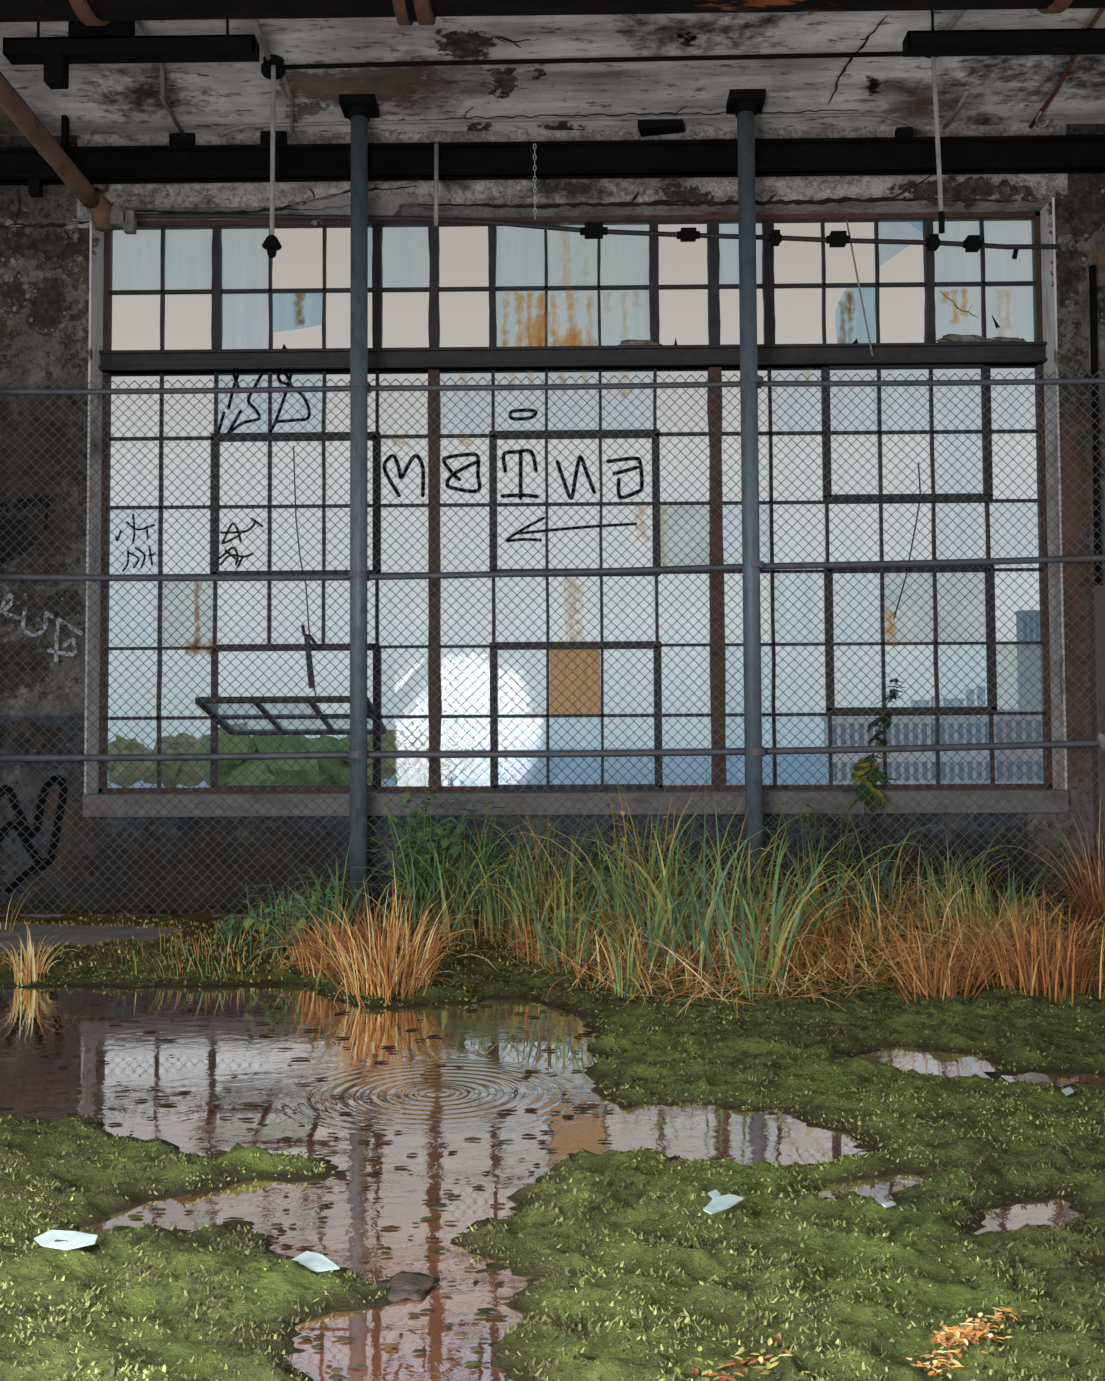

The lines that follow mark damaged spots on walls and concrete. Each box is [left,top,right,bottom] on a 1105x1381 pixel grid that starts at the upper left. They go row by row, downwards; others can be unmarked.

crack [494,37,530,48]
crack [401,106,726,120]
water stain [623,14,780,55]
crack [761,16,887,114]
peeling [0,194,100,337]
rust [502,222,637,347]
spalling [887,175,1105,322]